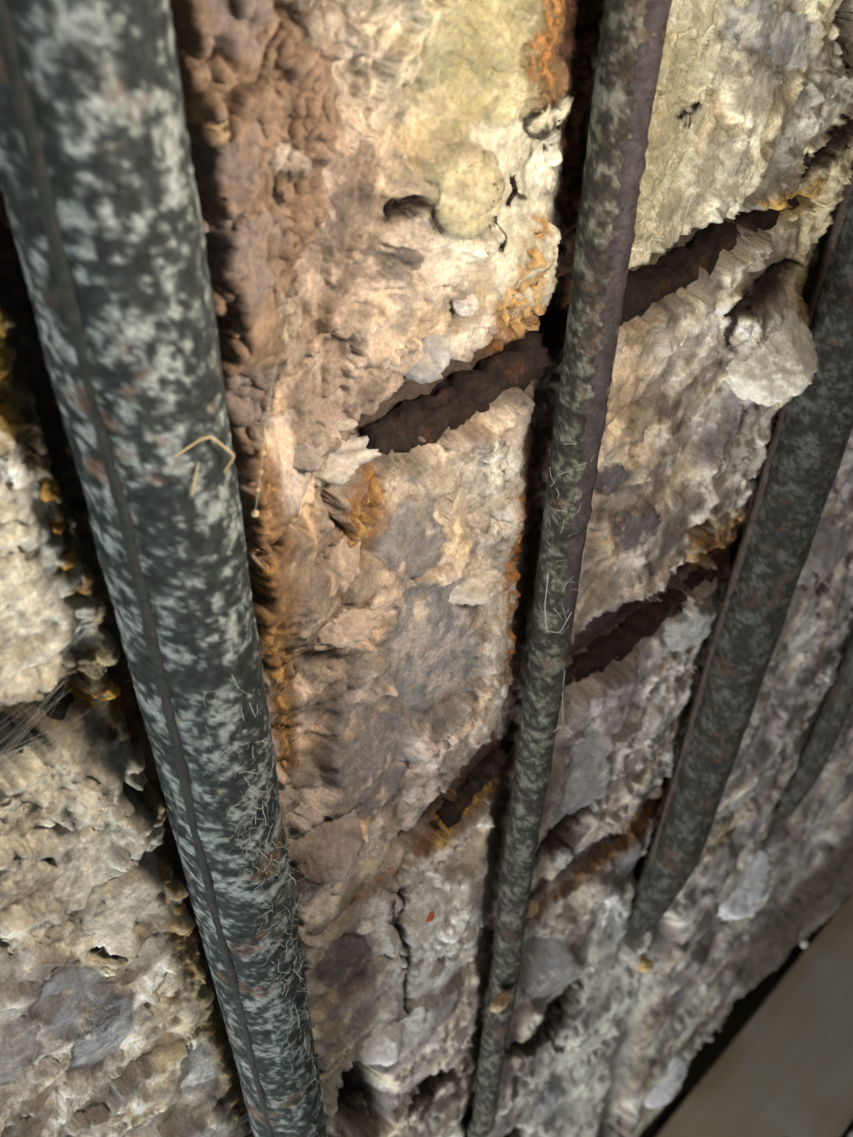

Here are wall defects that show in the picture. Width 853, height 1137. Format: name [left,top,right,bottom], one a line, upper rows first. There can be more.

peeling [169,0,349,471]
spalling [469,99,571,314]
corrosion [486,0,601,356]
corrosion [760,117,853,328]
spalling [0,443,98,704]
spalling [0,740,188,929]
corrosion [0,312,249,1128]
corrosion [246,444,301,770]
crack [391,889,415,1014]
flaking render [312,428,526,820]
spalling [508,832,659,1137]
corrosion [526,786,667,921]